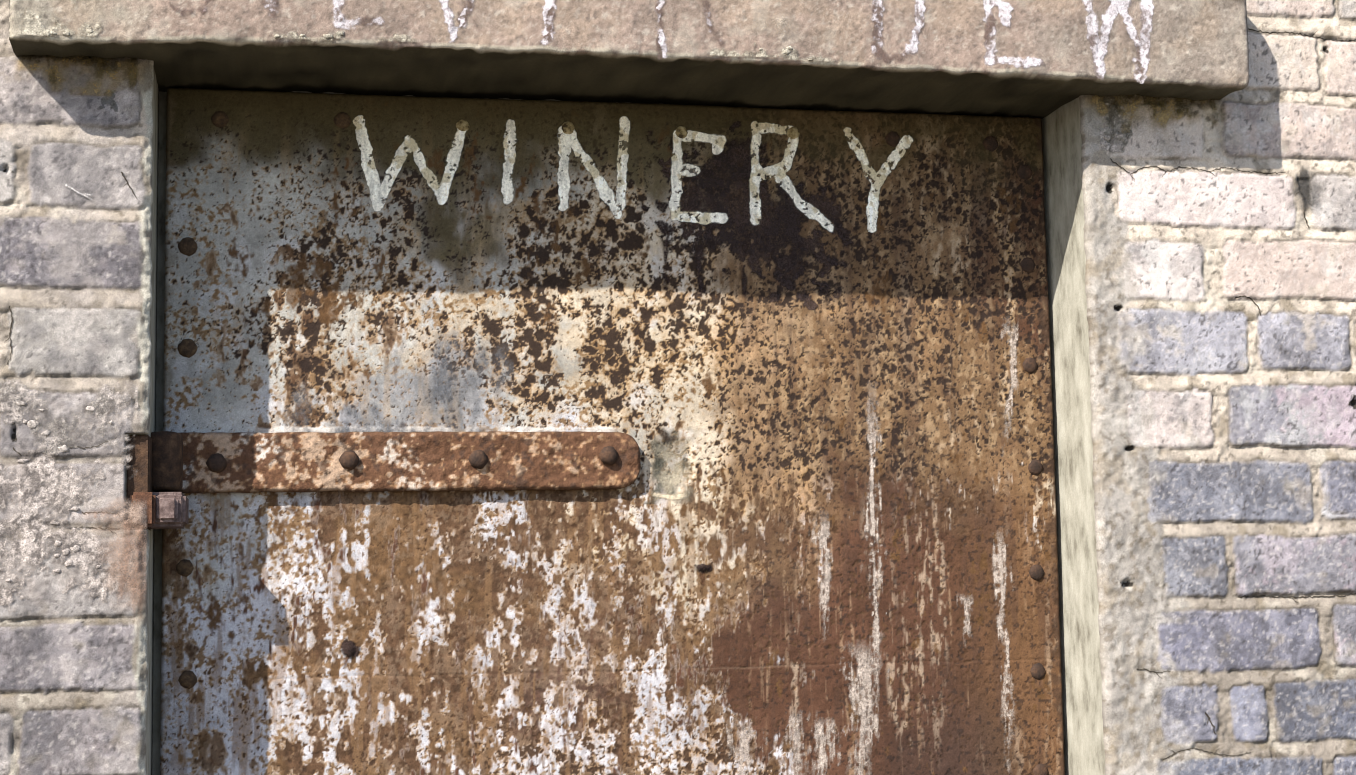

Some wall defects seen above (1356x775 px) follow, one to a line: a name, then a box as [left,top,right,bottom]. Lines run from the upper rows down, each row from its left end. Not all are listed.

corrosion [641,121,855,310]
crack [1110,158,1309,228]
crack [1163,712,1251,760]